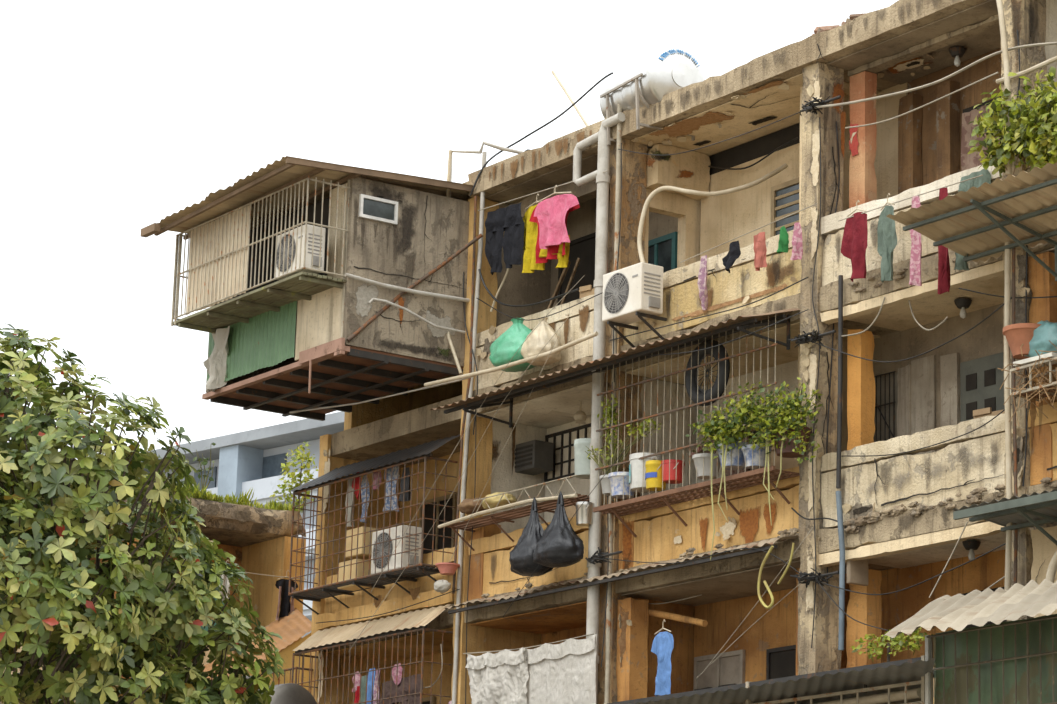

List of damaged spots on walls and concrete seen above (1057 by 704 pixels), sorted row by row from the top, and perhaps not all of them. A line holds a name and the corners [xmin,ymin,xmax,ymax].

peeling [807,75,822,103]
flaking render [634,111,735,146]
peeling [811,130,820,186]
leakage [371,188,416,253]
peeling [810,207,818,260]
leakage [382,340,450,359]
peeling [803,341,819,413]
peeling [808,450,826,542]
spalling [842,428,1026,535]
spalling [674,535,696,561]
spalling [777,528,800,541]
peeling [806,550,828,611]